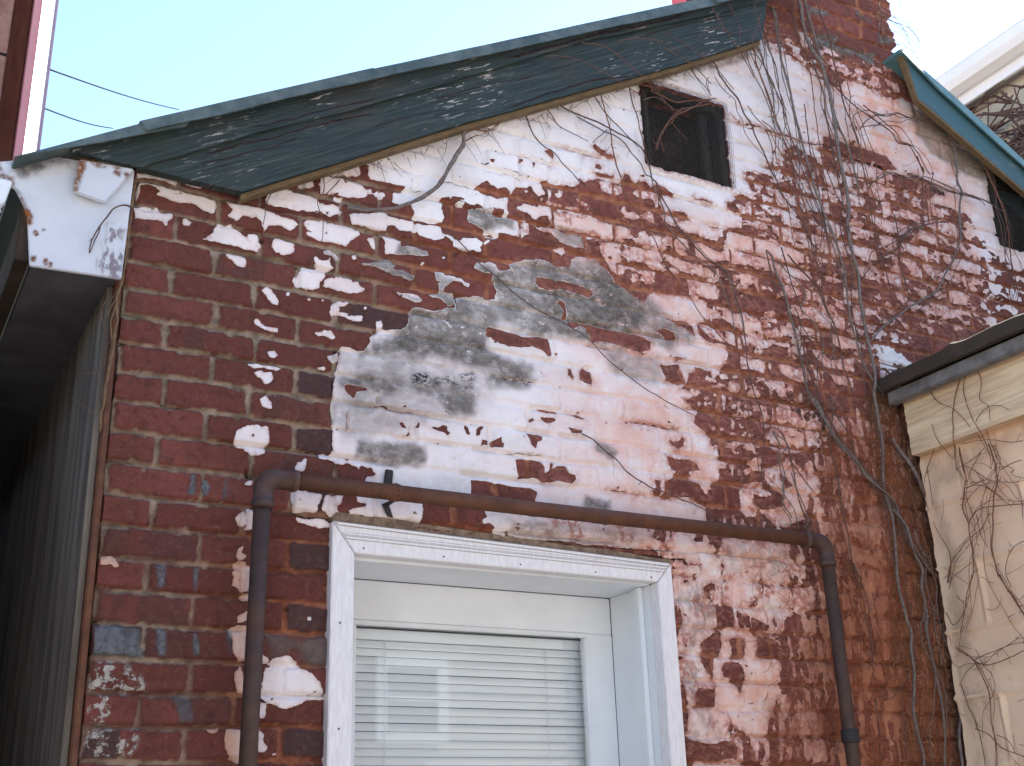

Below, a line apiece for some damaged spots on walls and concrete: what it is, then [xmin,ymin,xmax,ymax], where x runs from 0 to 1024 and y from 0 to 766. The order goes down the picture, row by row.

peeling [134,173,217,226]
leakage [362,246,428,279]
leakage [373,260,688,414]
peeling [203,25,1024,766]
leakage [358,442,425,466]